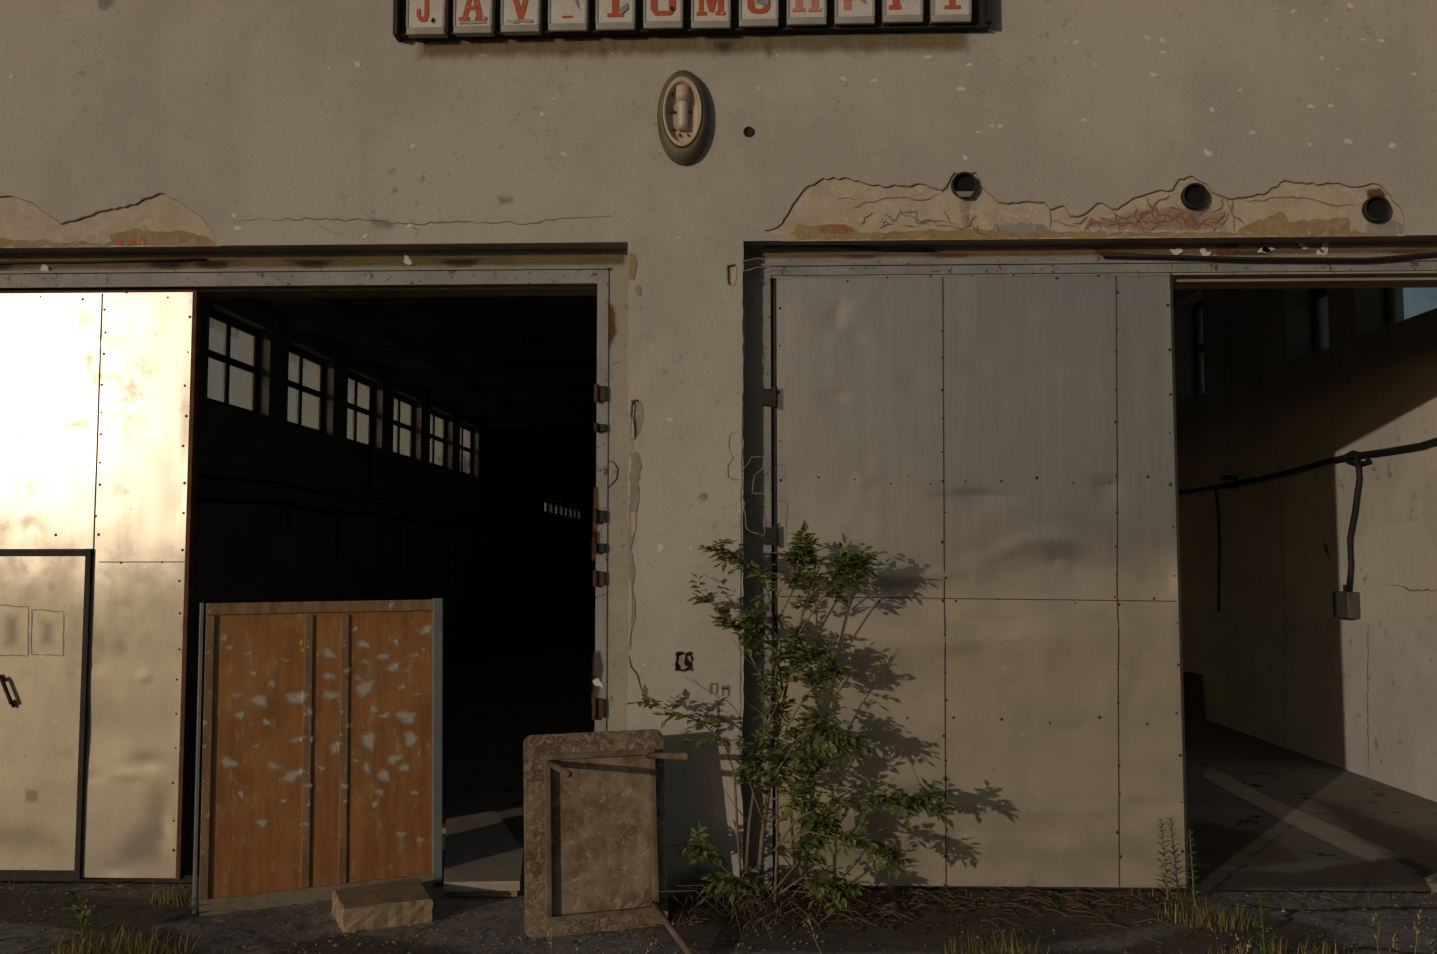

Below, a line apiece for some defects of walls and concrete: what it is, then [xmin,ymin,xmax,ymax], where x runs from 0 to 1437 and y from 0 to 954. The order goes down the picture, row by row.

peeling [0,192,220,274]
crack [242,216,611,233]
peeling [766,154,1405,256]